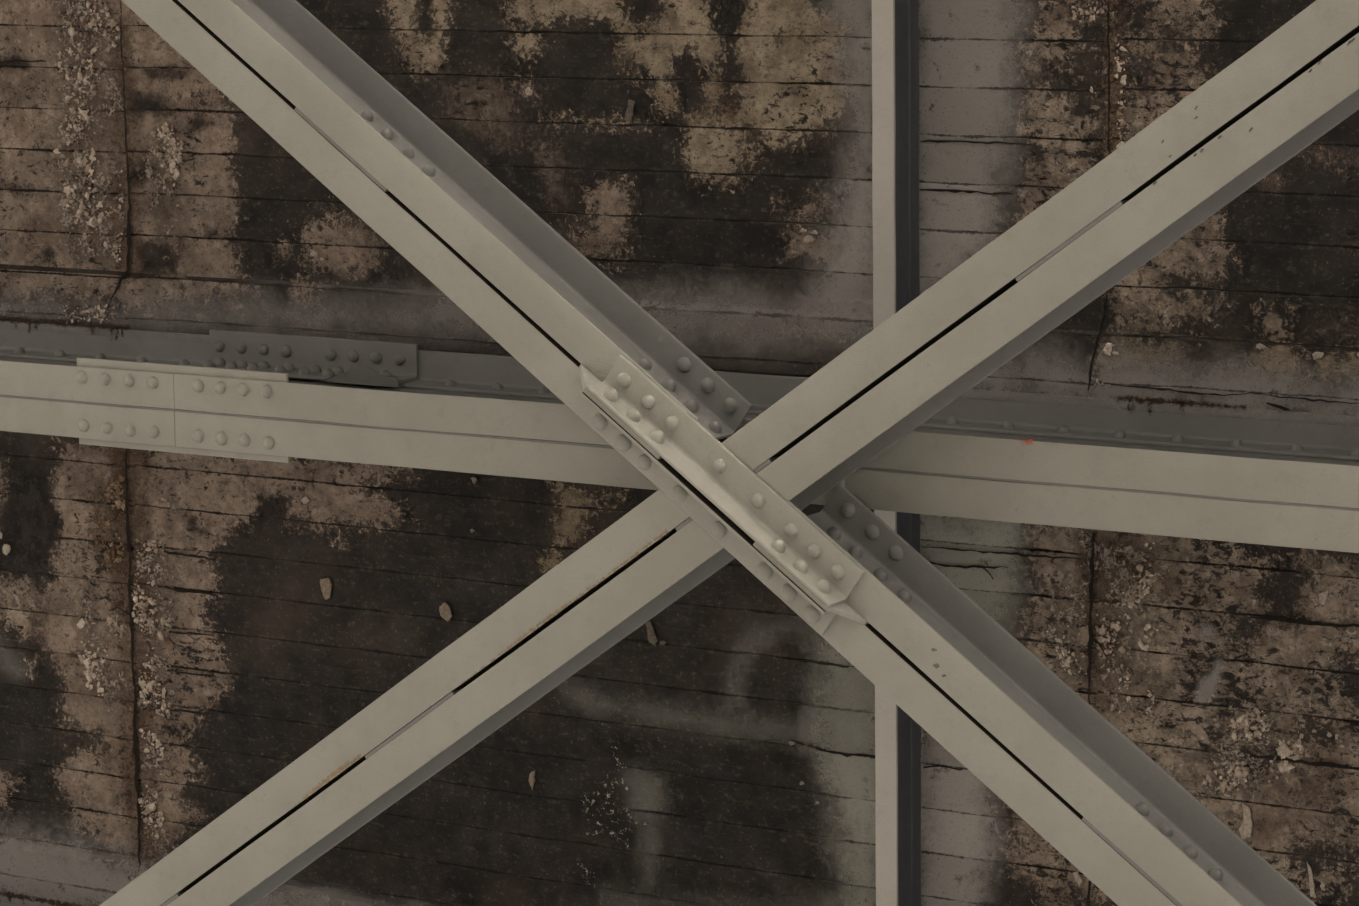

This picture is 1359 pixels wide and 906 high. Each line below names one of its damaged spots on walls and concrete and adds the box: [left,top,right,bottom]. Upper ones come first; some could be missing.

water stain [43,0,208,278]
crack [107,0,148,307]
crack [1105,0,1113,151]
water stain [1114,34,1137,148]
rust [1118,395,1247,414]
water stain [0,466,60,578]
water stain [76,474,179,857]
crack [110,448,202,872]
crack [164,550,218,597]
crack [169,629,214,637]
water stain [1041,529,1177,718]
water stain [1202,706,1310,797]